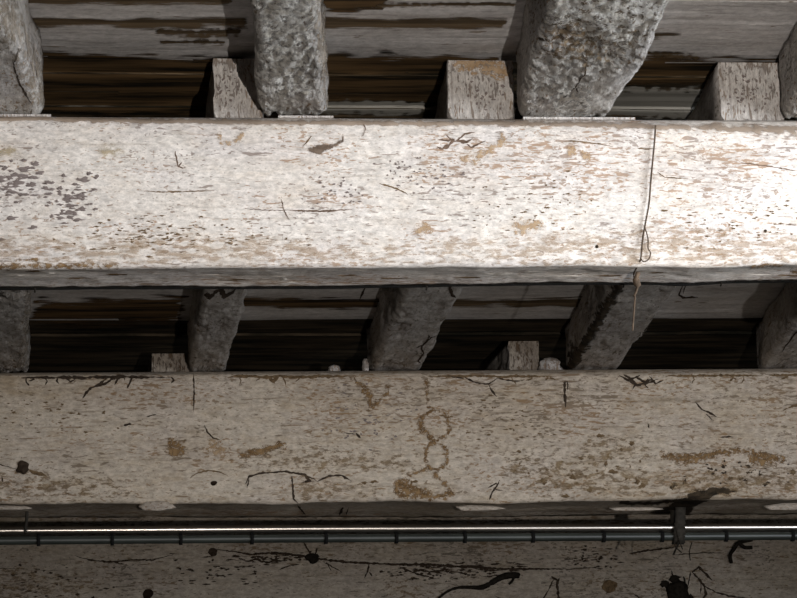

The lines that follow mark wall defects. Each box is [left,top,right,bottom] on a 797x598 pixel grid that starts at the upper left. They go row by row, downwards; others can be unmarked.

crack [21,374,219,440]
crack [0,464,45,482]
crack [245,470,351,515]
crack [217,543,599,598]